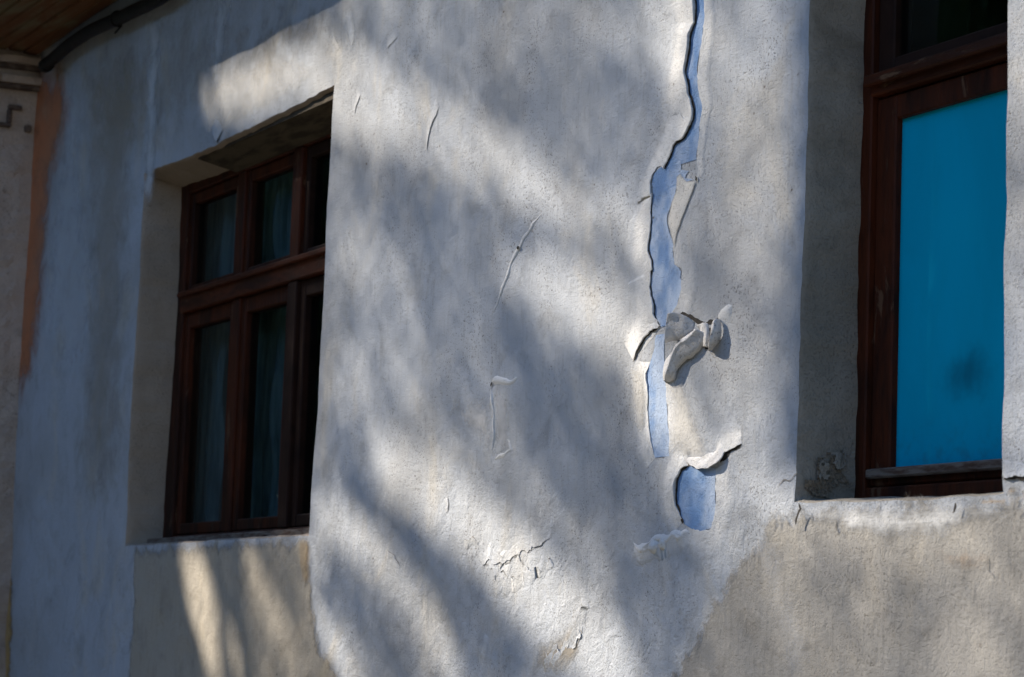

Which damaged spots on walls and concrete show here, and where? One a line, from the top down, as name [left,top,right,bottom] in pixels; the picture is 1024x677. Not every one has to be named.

crack [491,213,542,315]
peeling [658,423,742,560]
crack [479,522,554,598]